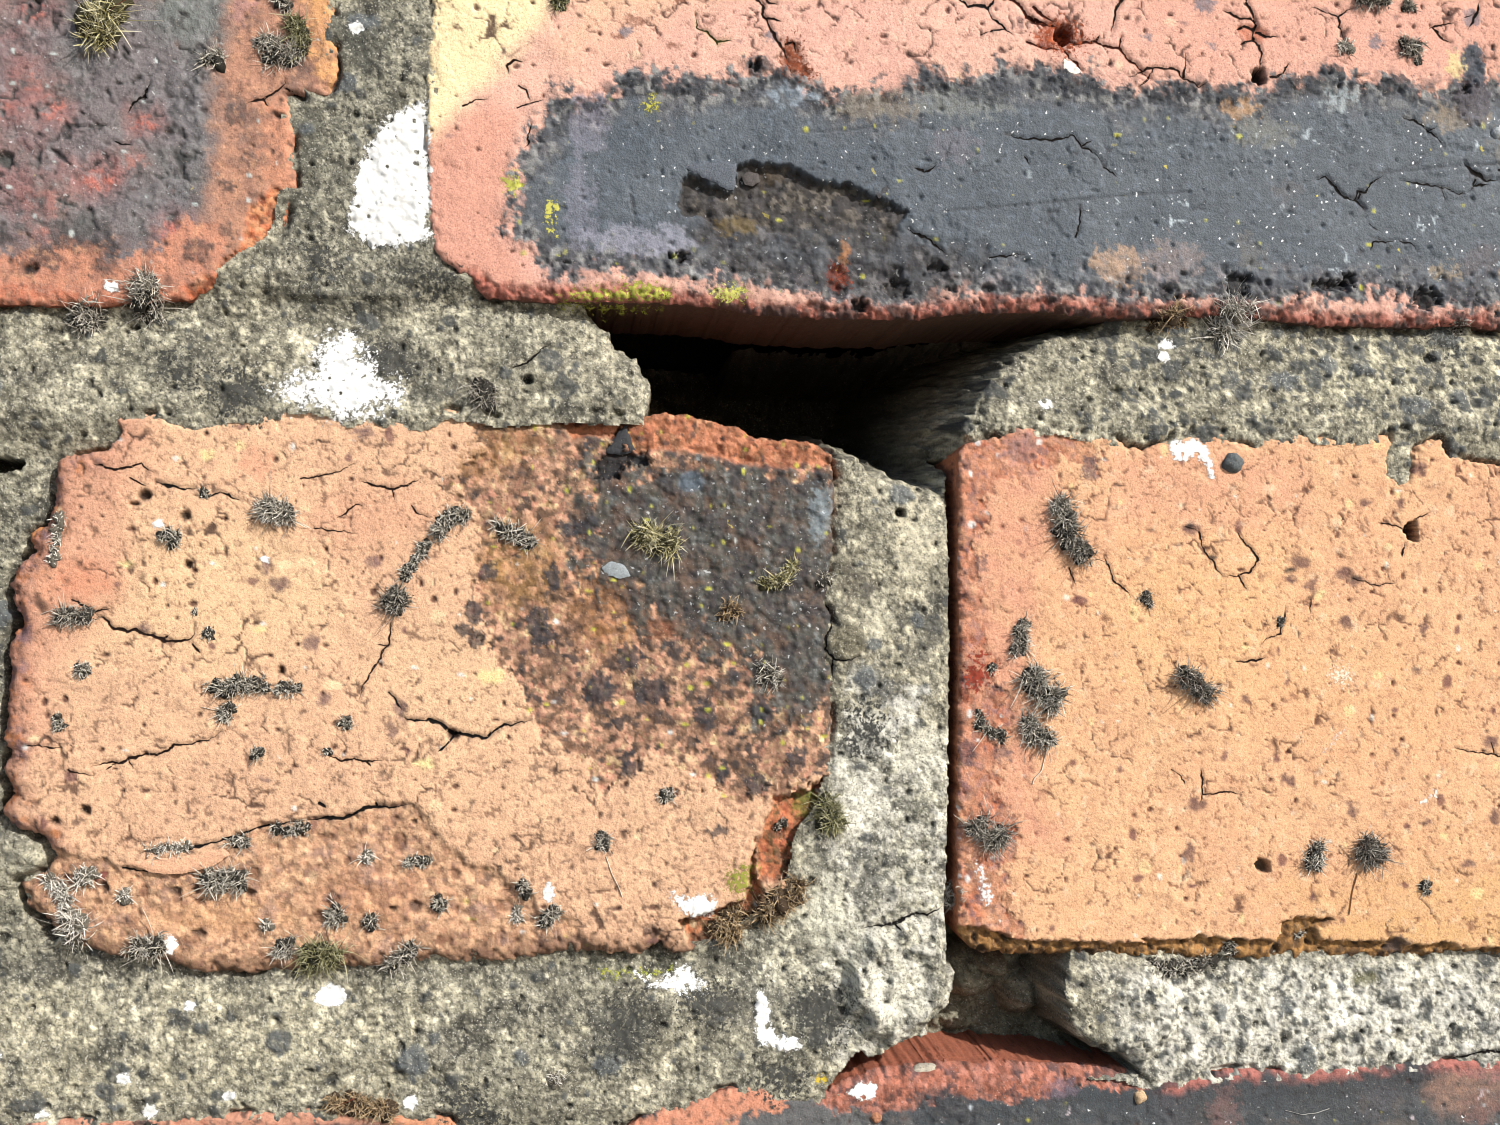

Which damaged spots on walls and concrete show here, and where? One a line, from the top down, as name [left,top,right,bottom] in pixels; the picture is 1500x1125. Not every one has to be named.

crack [756,0,797,73]
crack [959,0,1204,88]
crack [1223,0,1289,79]
crack [1429,4,1479,43]
spalling [678,161,907,268]
crack [1317,118,1500,250]
crack [71,599,200,653]
crack [359,627,530,752]
crack [27,732,220,775]
crack [330,756,381,766]
spalling [925,428,1500,1074]
crack [122,801,406,872]